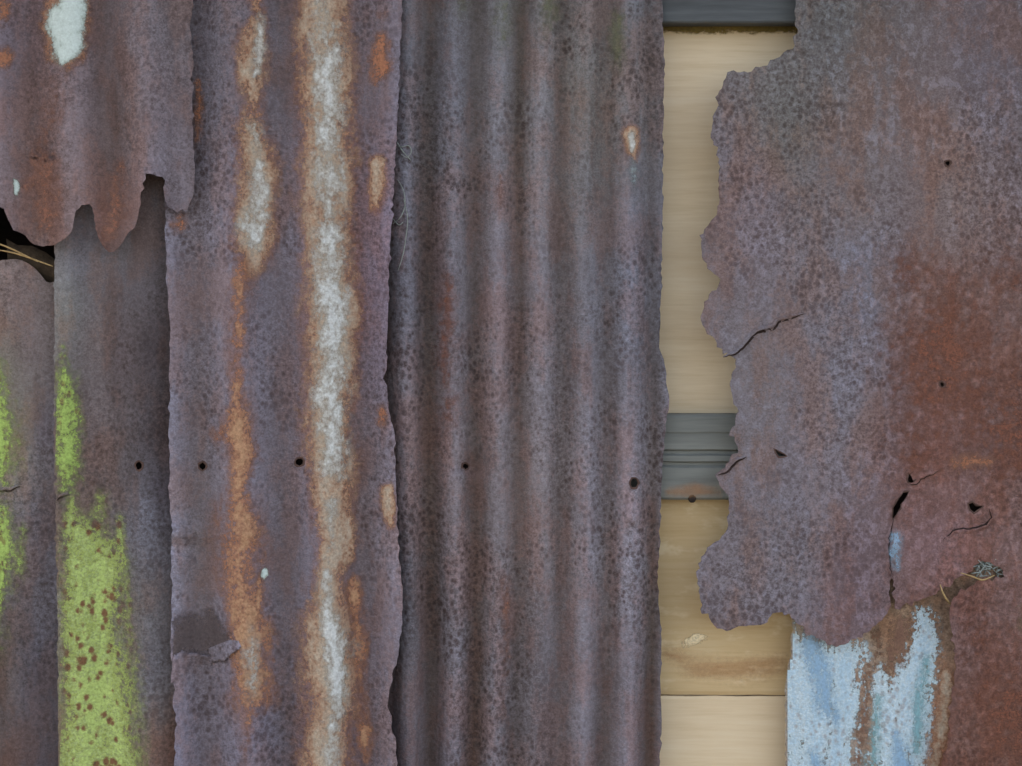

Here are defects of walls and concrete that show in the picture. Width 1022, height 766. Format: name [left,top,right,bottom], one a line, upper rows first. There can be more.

peeling [45,0,87,65]
corrosion [0,0,323,766]
corrosion [336,0,669,766]
crack [723,313,804,357]
crack [909,470,939,485]
crack [943,509,995,540]
peeling [787,606,941,766]
corrosion [854,613,914,766]
corrosion [925,667,954,766]